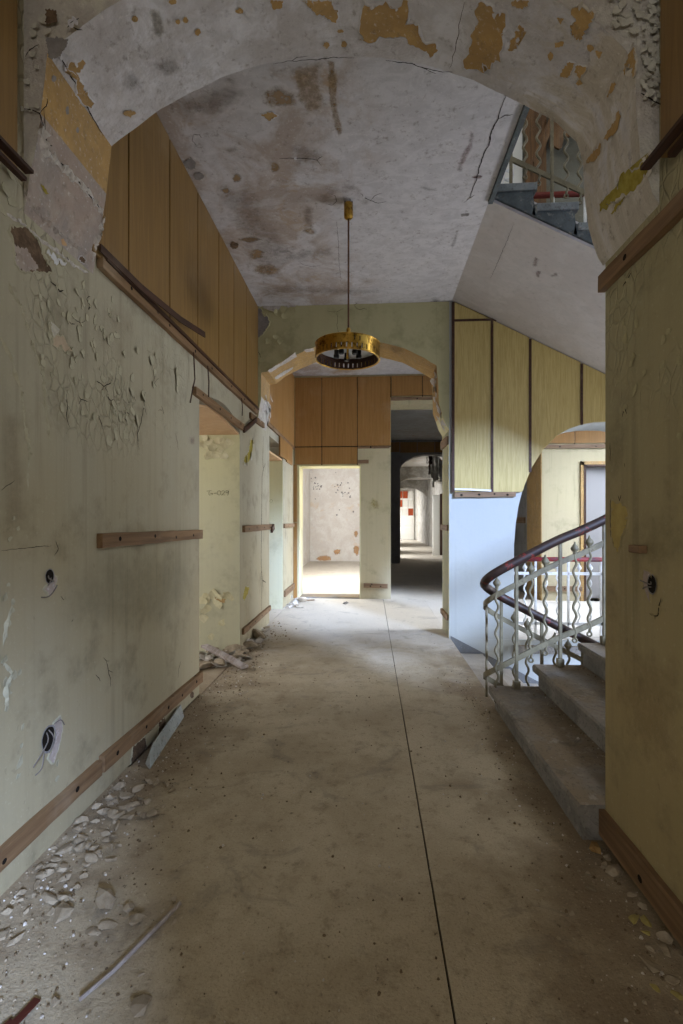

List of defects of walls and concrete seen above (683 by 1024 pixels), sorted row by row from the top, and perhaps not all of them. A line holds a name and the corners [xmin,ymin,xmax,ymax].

spalling [7,123,105,275]
peeling [24,9,96,115]
water stain [267,62,341,133]
peeling [302,0,440,59]
crack [465,97,513,202]
peeling [462,0,531,77]
peeling [548,1,602,86]
peeling [586,111,621,163]
peeling [598,149,652,214]
peeling [607,0,661,98]